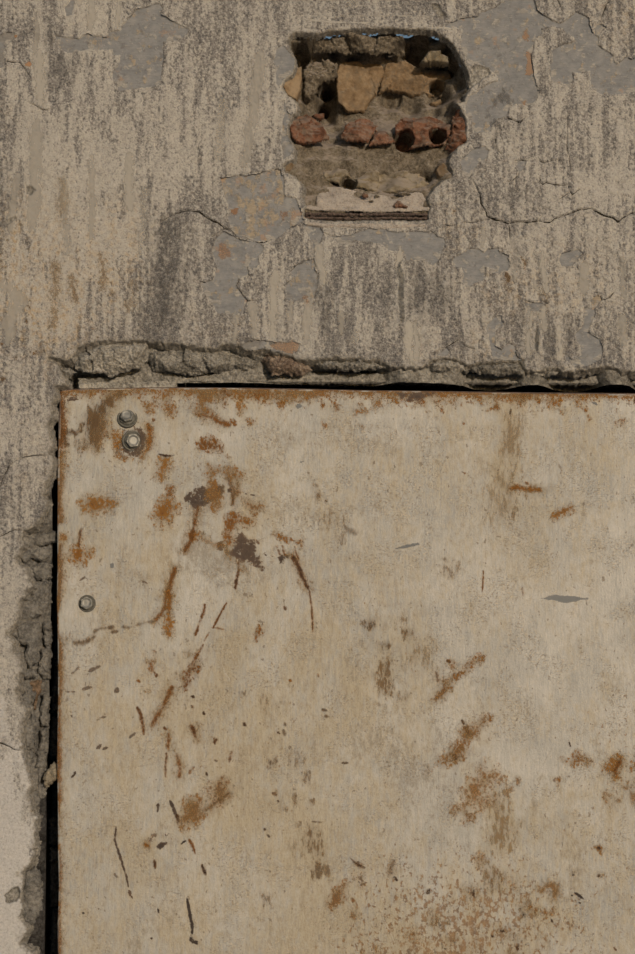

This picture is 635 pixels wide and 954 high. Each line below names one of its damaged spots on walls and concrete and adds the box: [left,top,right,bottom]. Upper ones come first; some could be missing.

peeling [56,1,188,91]
crack [163,211,267,243]
spalling [218,32,490,302]
crack [445,118,635,237]
flaking render [57,311,635,392]
corrosion [58,389,635,637]
flaking render [11,486,58,810]
corrosion [376,643,394,696]
corrosion [438,712,522,854]
corrosion [560,742,635,789]
flaking render [4,816,59,954]
corrosion [297,821,330,879]